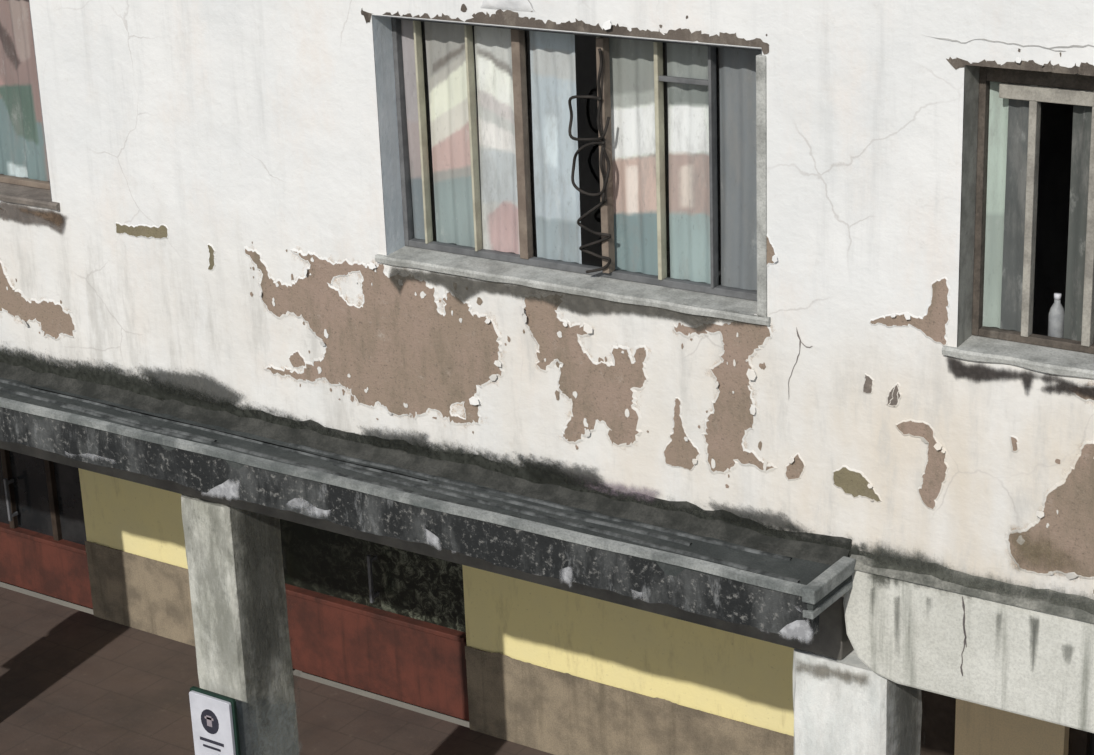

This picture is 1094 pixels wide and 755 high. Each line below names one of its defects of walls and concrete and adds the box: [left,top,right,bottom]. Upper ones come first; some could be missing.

flaking render [0,260,77,341]
flaking render [243,242,510,434]
flaking render [519,298,649,450]
flaking render [663,314,806,488]
flaking render [869,277,951,346]
flaking render [1069,382,1094,403]
spalling [1010,435,1019,453]
water stain [207,480,237,498]
water stain [426,529,439,546]
water stain [579,482,654,501]
flaking render [1005,440,1094,593]
crack [959,597,967,676]